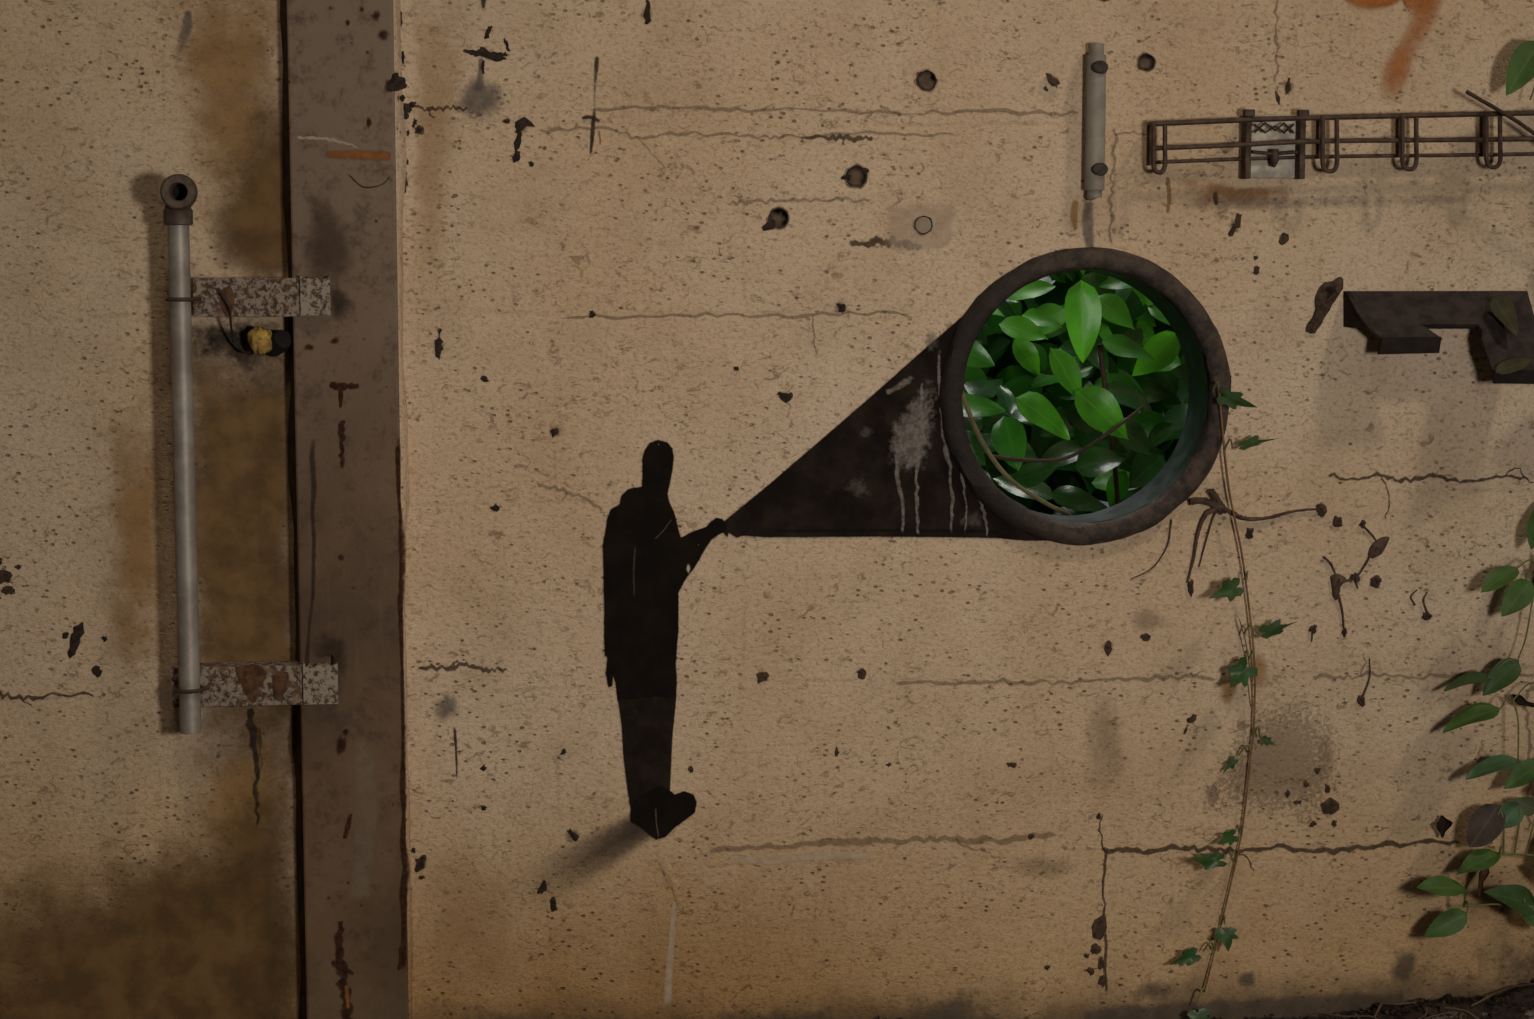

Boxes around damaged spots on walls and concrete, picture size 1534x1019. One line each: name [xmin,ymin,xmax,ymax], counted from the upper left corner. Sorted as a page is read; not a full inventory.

leakage [183,11,288,276]
leakage [193,325,294,663]
corrosion [305,447,342,671]
crack [1329,467,1534,518]
corrosion [235,664,289,703]
corrosion [395,445,410,970]
leakage [0,705,297,1019]
corrosion [331,921,354,1019]
crack [1098,815,1459,991]